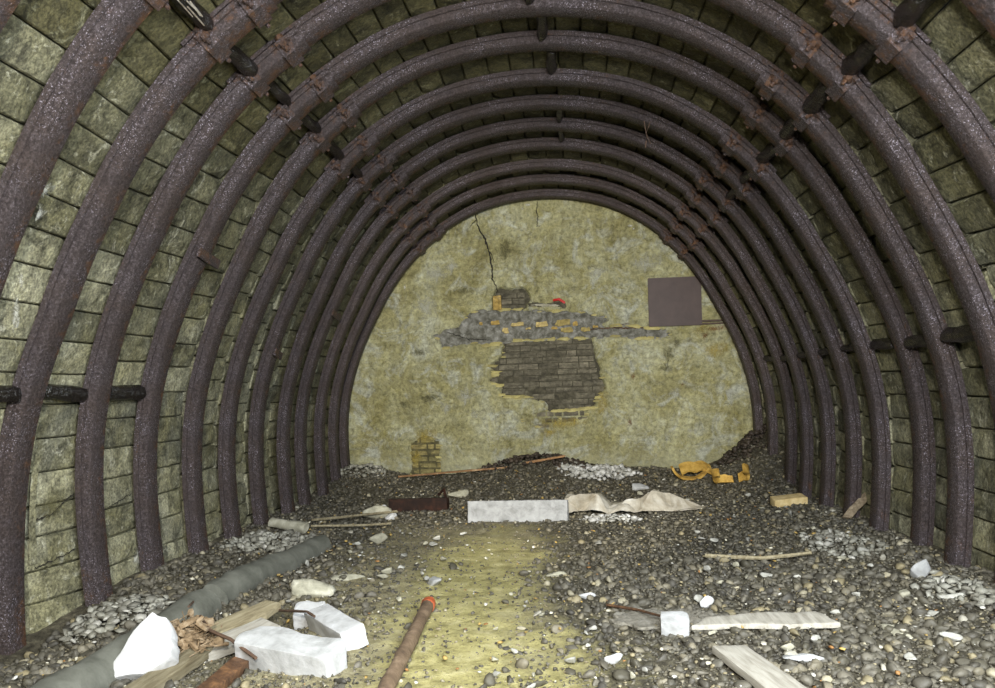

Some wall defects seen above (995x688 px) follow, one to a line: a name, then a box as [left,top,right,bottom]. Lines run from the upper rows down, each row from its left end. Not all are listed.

crack [470,214,498,291]
flaking render [433,288,672,428]
flaking render [409,435,443,475]